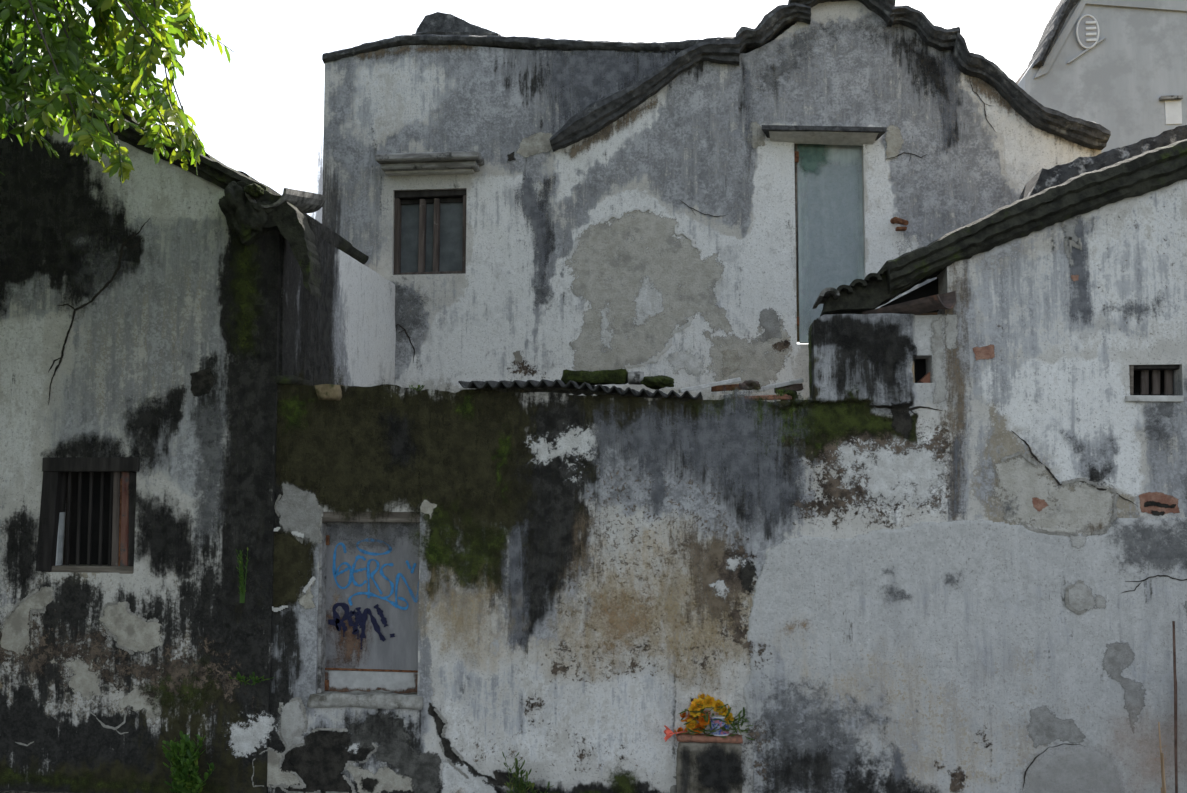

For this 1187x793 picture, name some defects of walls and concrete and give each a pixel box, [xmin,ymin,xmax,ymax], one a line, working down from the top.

water stain [0,119,133,314]
crack [48,218,150,405]
water stain [515,173,555,307]
spalling [564,206,793,393]
peeling [274,483,323,544]
water stain [420,500,437,520]
water stain [491,390,807,647]
spalling [990,451,1119,537]
water stain [1109,518,1187,572]
crack [1122,575,1187,593]
flaking render [1139,492,1180,516]
spalling [0,586,520,793]